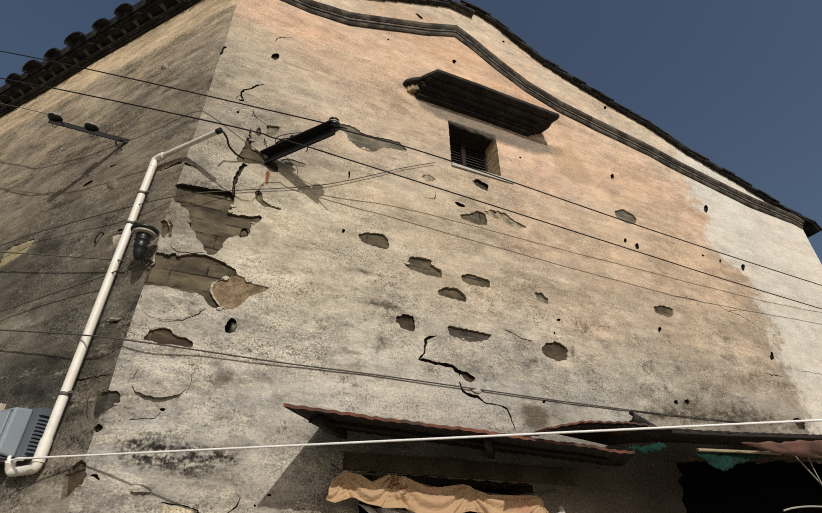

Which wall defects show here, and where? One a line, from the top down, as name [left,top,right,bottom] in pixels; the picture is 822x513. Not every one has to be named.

crack [236,84,269,134]
flaking render [340,123,407,152]
crack [160,161,247,199]
flaking render [140,183,284,310]
peeling [358,232,389,249]
peeling [404,256,442,278]
peeling [438,274,490,302]
flaking render [144,327,193,348]
peeling [448,325,491,342]
peeling [542,332,568,362]
crack [418,335,516,430]
crack [161,502,199,513]